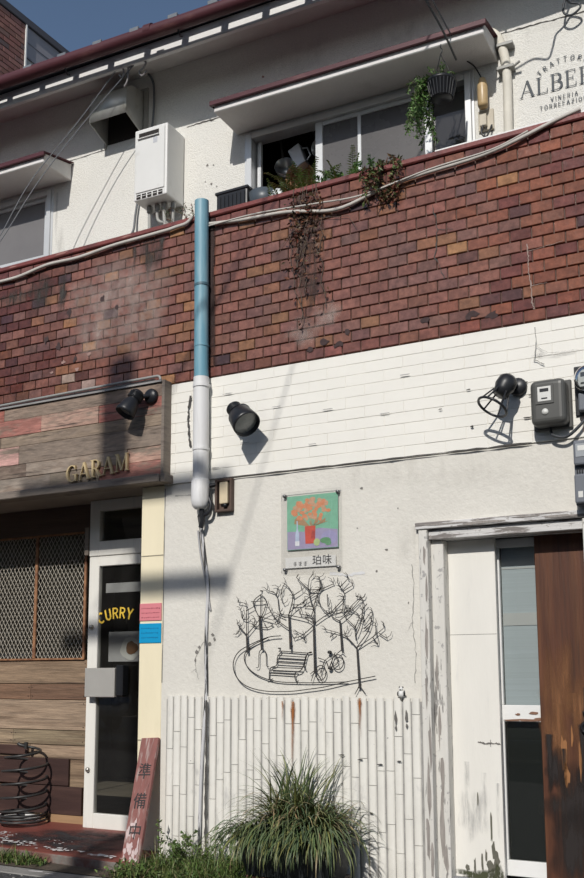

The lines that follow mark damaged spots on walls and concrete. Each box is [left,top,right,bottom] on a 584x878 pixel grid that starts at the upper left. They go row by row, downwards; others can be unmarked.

peeling [425,622,449,876]
peeling [465,812,500,874]